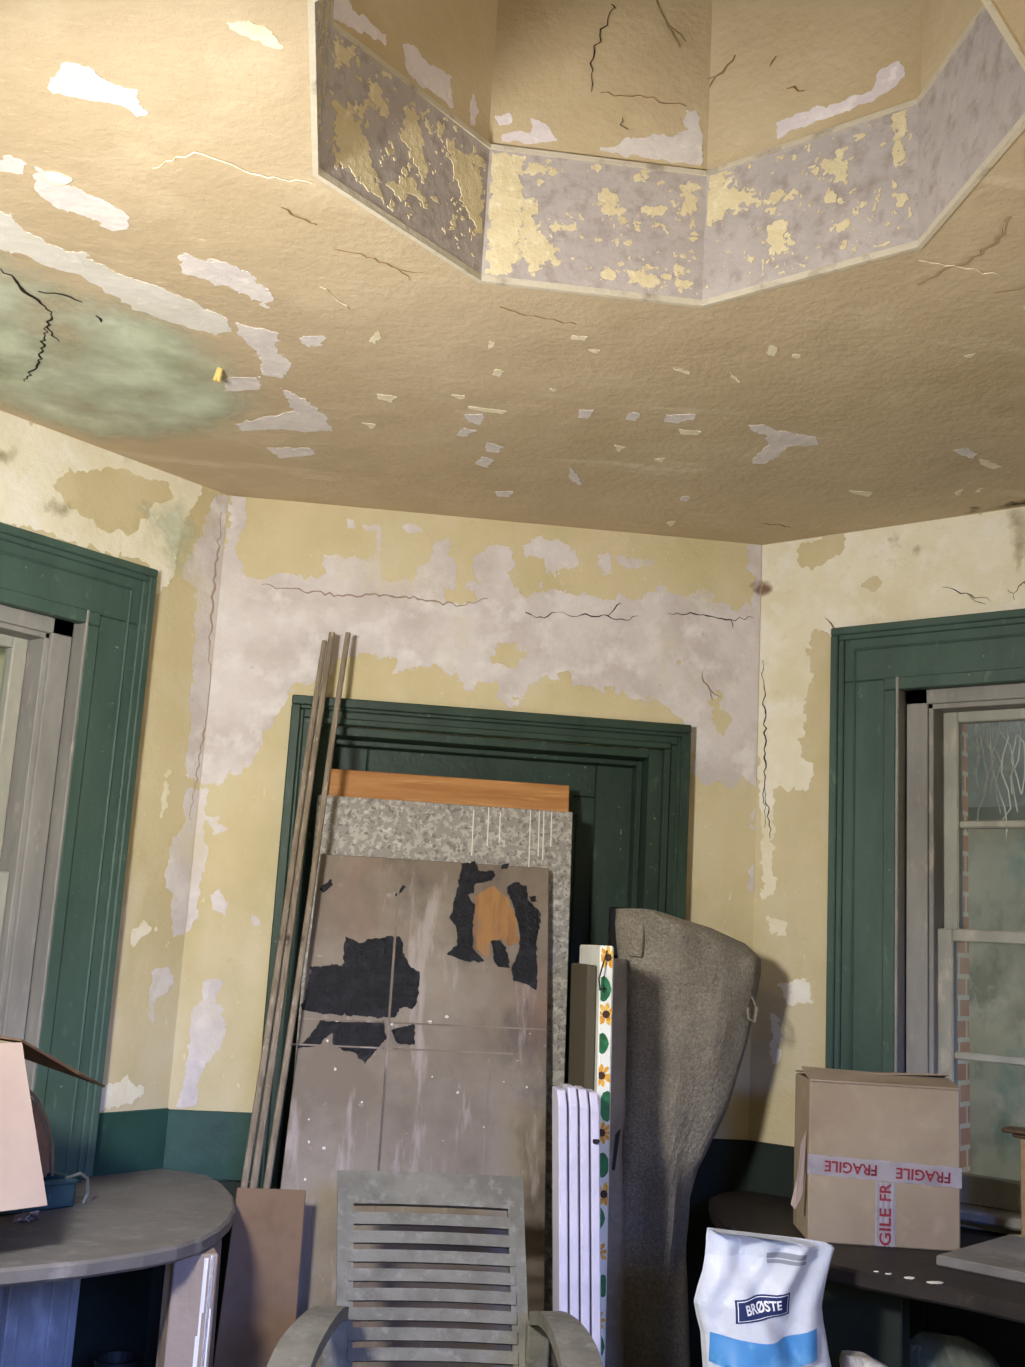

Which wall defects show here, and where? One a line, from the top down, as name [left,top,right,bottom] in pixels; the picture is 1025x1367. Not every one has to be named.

peeling [0,155,130,231]
peeling [47,62,149,117]
peeling [316,0,913,294]
crack [590,0,735,130]
crack [0,269,102,382]
water stain [0,274,231,434]
peeling [0,211,332,458]
crack [189,512,222,820]
flaking render [0,410,1025,947]
crack [525,603,634,621]
crack [761,660,771,835]
flaking render [176,978,226,1109]